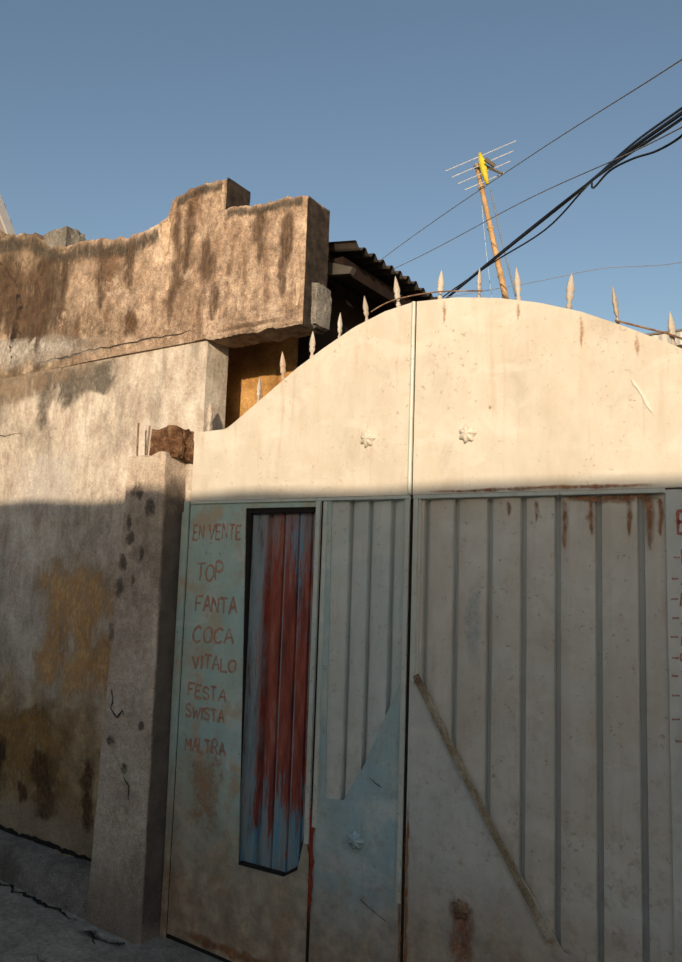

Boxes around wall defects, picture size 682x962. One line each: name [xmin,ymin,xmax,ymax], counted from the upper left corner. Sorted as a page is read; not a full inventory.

water stain [0,231,159,350]
water stain [167,178,330,334]
crack [0,262,194,404]
spalling [136,423,194,463]
water stain [115,515,143,597]
water stain [132,485,154,514]
rust [453,484,664,547]
water stain [0,705,93,828]
crack [0,882,77,921]